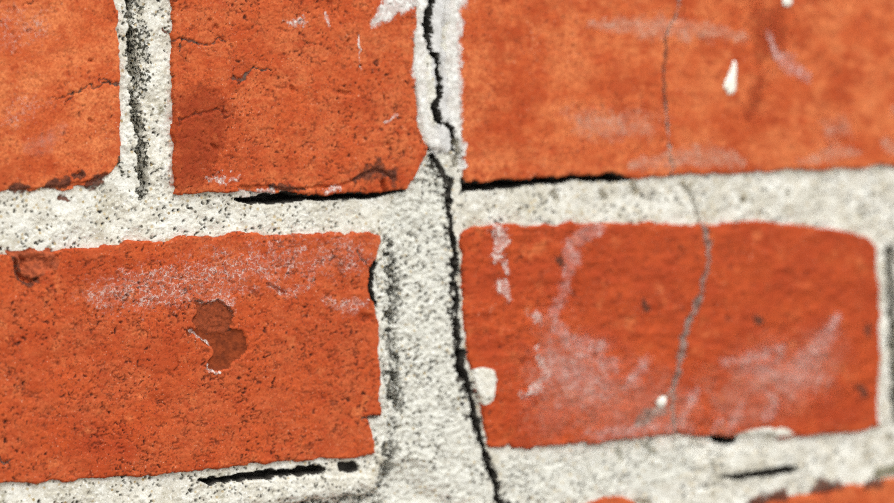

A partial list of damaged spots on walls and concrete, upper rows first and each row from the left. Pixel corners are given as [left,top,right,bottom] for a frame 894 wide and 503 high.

peeling [5,247,60,288]
crack [421,0,511,503]
efflorescence [491,222,511,301]
crack [645,0,713,433]
spalling [186,299,247,375]